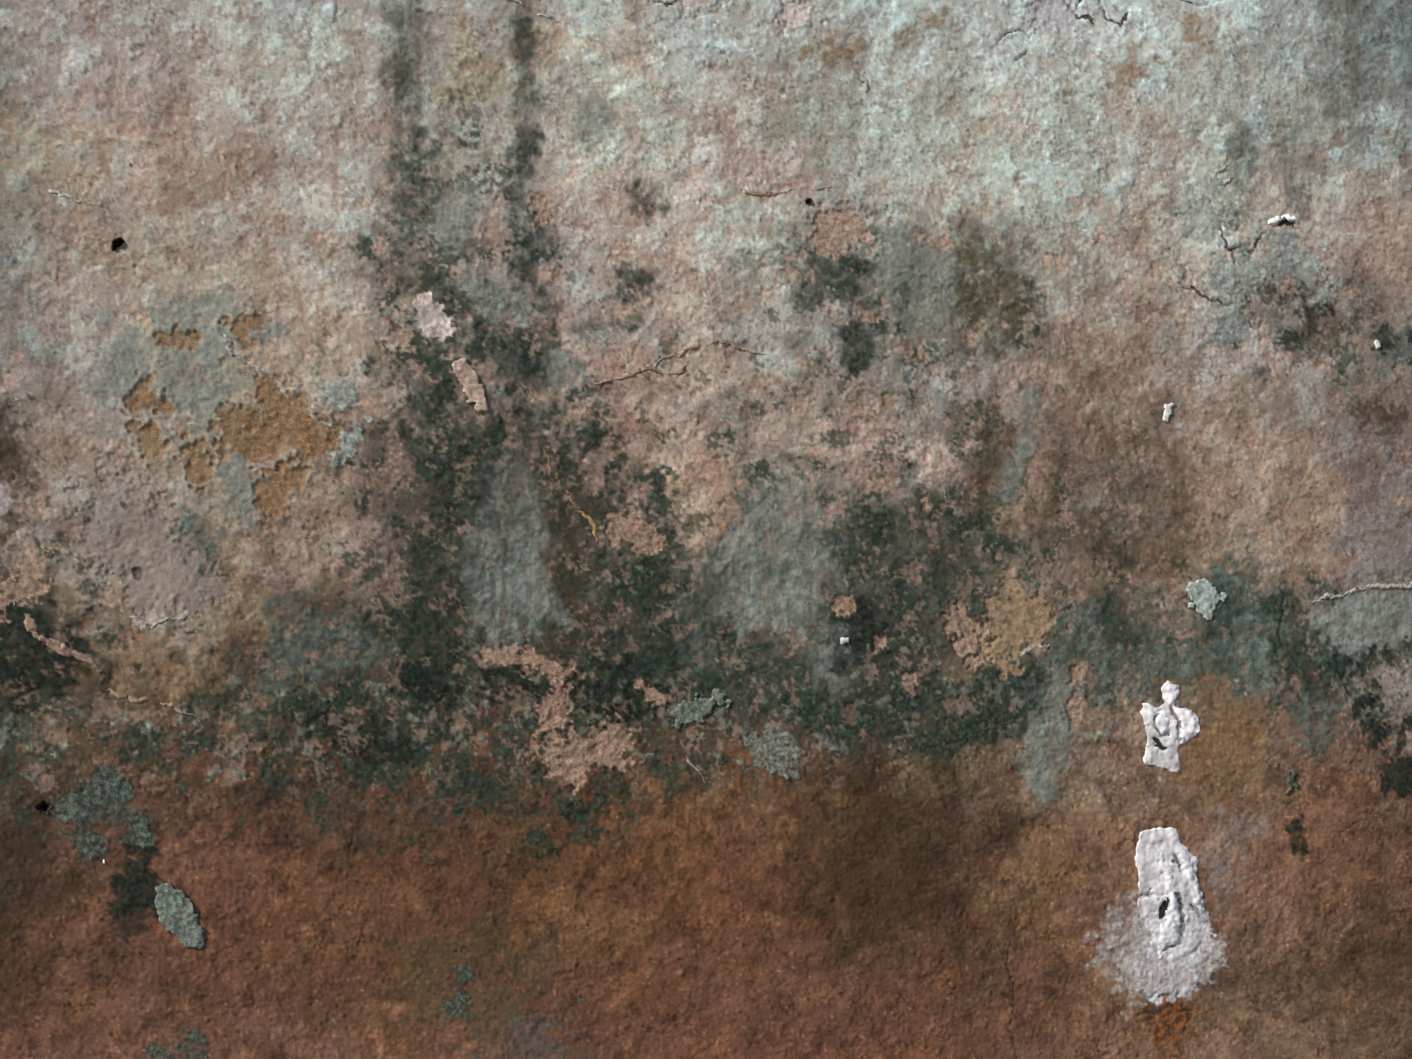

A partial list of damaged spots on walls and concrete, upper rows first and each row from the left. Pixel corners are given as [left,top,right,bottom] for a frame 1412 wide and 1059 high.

crack [1064,0,1128,27]
spalling [153,325,202,350]
spalling [219,314,265,350]
leakage [358,126,592,519]
leakage [616,262,653,330]
spalling [65,368,373,637]
leakage [0,579,112,712]
leakage [389,412,692,815]
leakage [715,527,843,642]
leakage [785,652,1074,800]
leakage [1266,589,1412,798]
rust [1130,985,1205,1059]